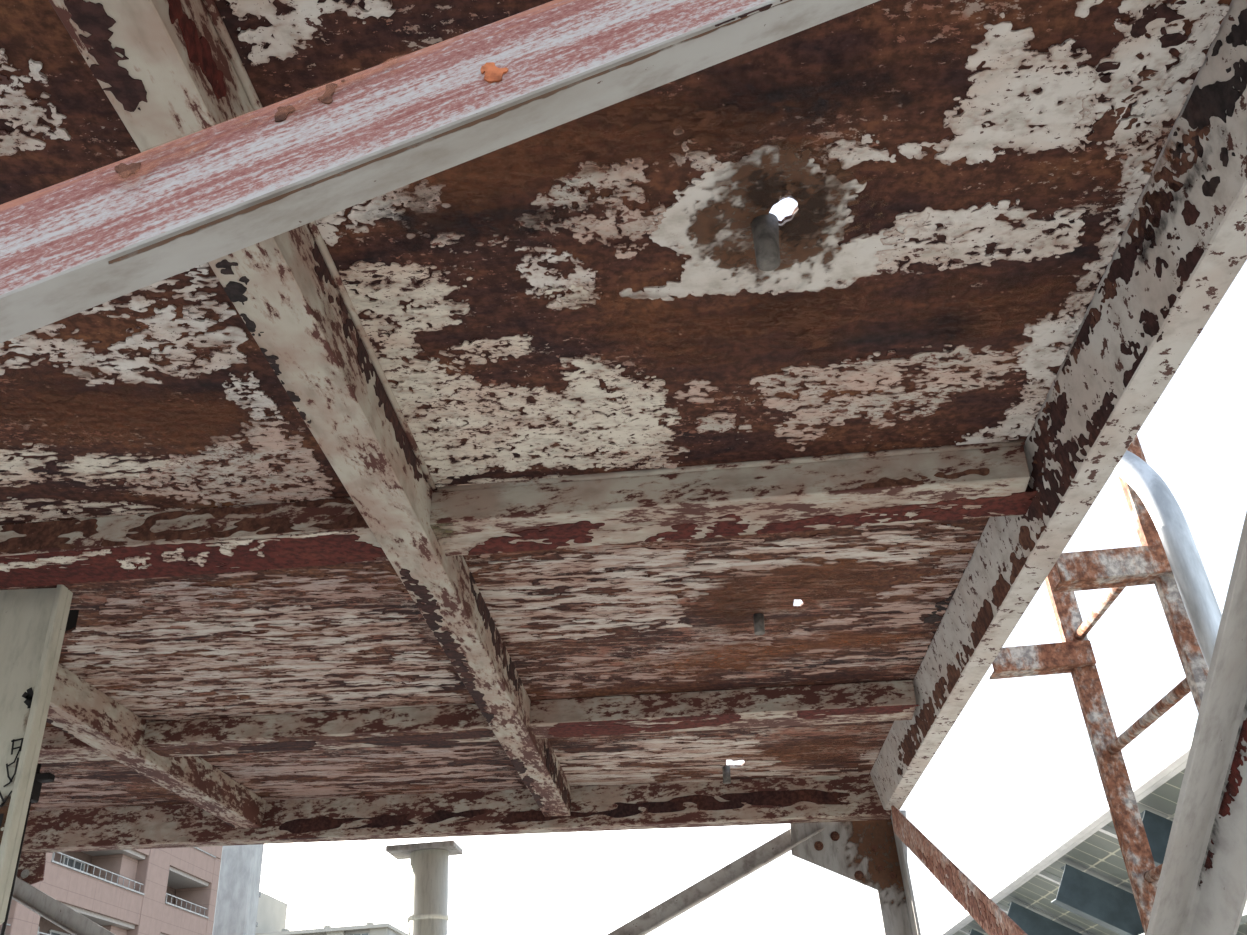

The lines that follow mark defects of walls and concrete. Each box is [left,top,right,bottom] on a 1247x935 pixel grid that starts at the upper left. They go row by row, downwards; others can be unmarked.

corrosion [64,0,147,112]
peeling [217,0,396,67]
corrosion [108,0,792,264]
corrosion [405,100,887,286]
peeling [407,0,1229,451]
corrosion [1130,0,1188,48]
peeling [0,263,335,523]
peeling [338,260,753,487]
corrosion [645,8,1247,775]
peeling [467,523,980,696]
corrosion [501,714,851,823]
peeling [553,731,888,786]